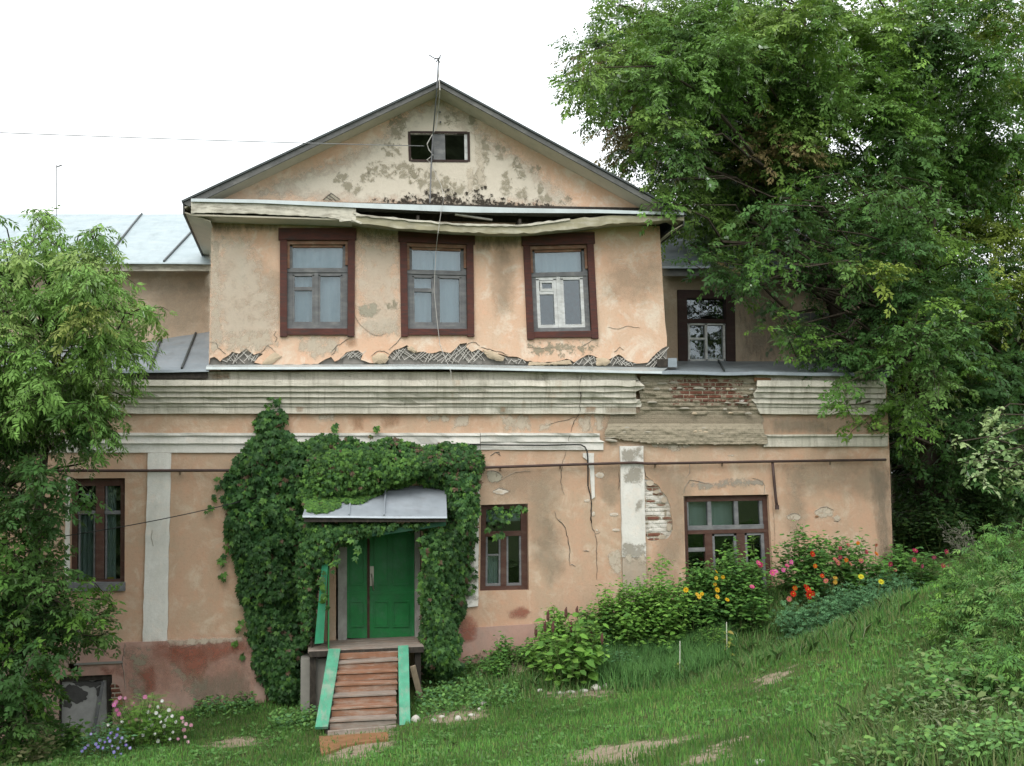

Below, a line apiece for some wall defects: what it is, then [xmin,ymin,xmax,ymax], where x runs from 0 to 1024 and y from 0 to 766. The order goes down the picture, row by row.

peeling [260,102,572,206]
peeling [299,337,366,364]
flaking render [388,345,487,365]
flaking render [505,342,677,368]
crack [547,376,599,570]
spalling [609,447,672,573]
water stain [167,636,242,646]